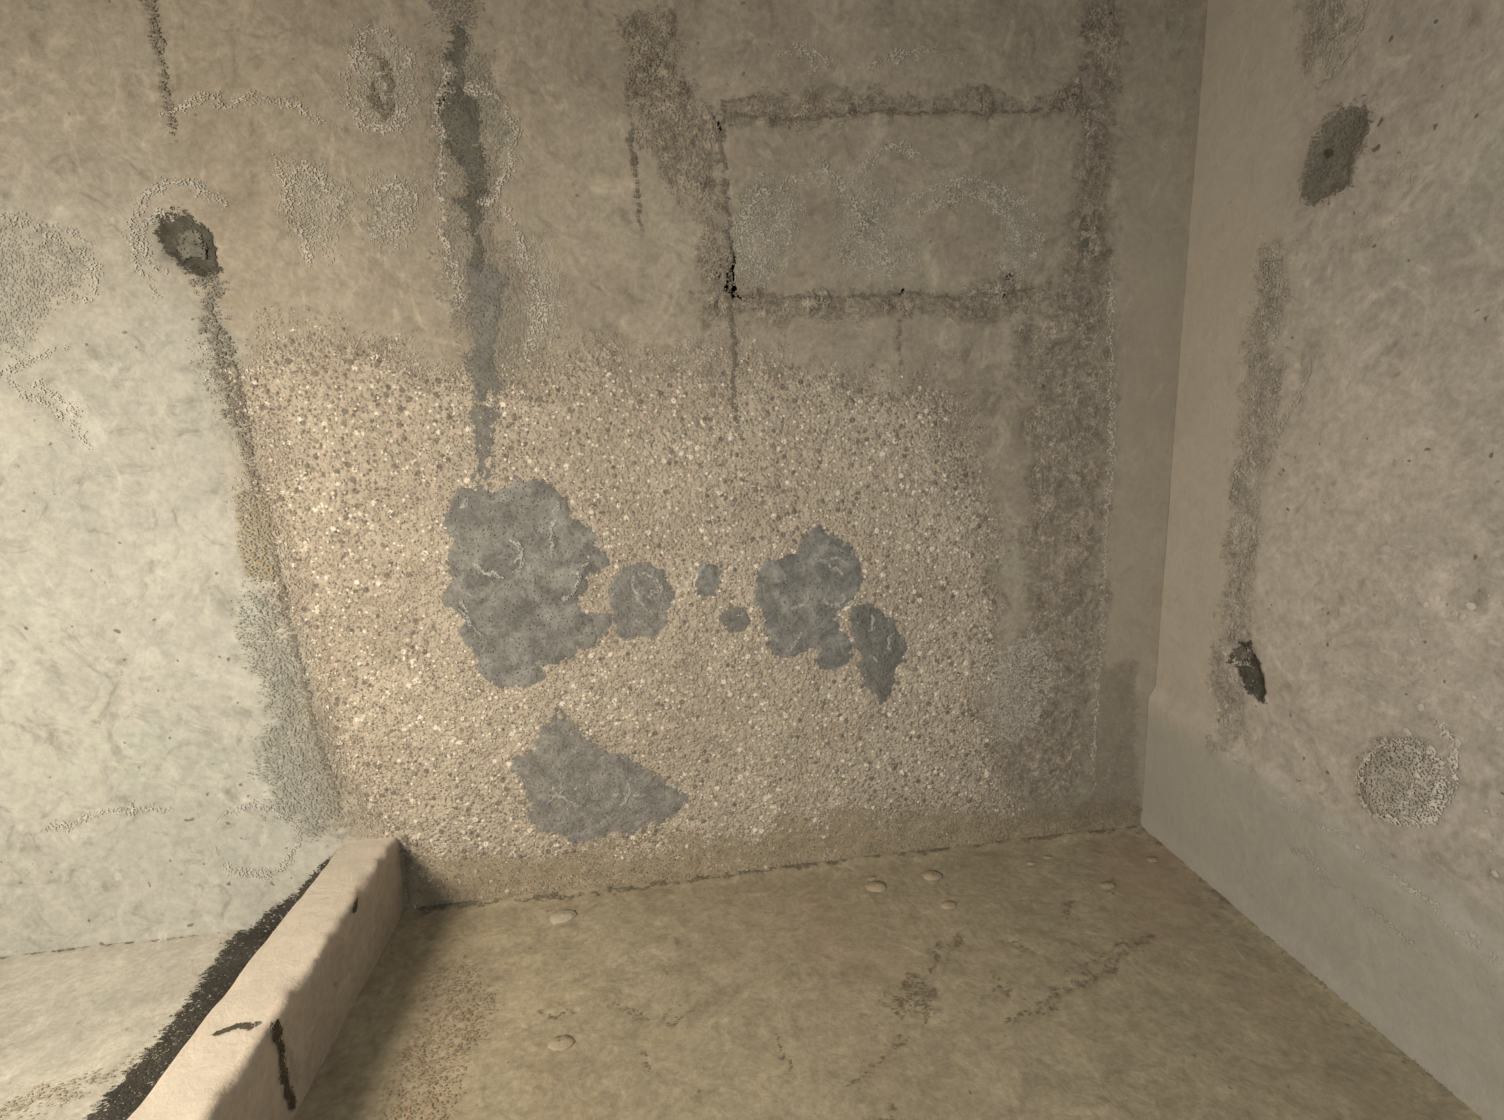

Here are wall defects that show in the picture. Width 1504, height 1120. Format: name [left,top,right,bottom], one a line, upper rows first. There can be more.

water stain [413,0,533,507]
crack [718,95,1065,452]
spalling [1297,94,1378,208]
spalling [152,0,1132,908]
flaking render [1202,228,1318,756]
crack [211,1019,301,1113]
crack [351,898,359,914]